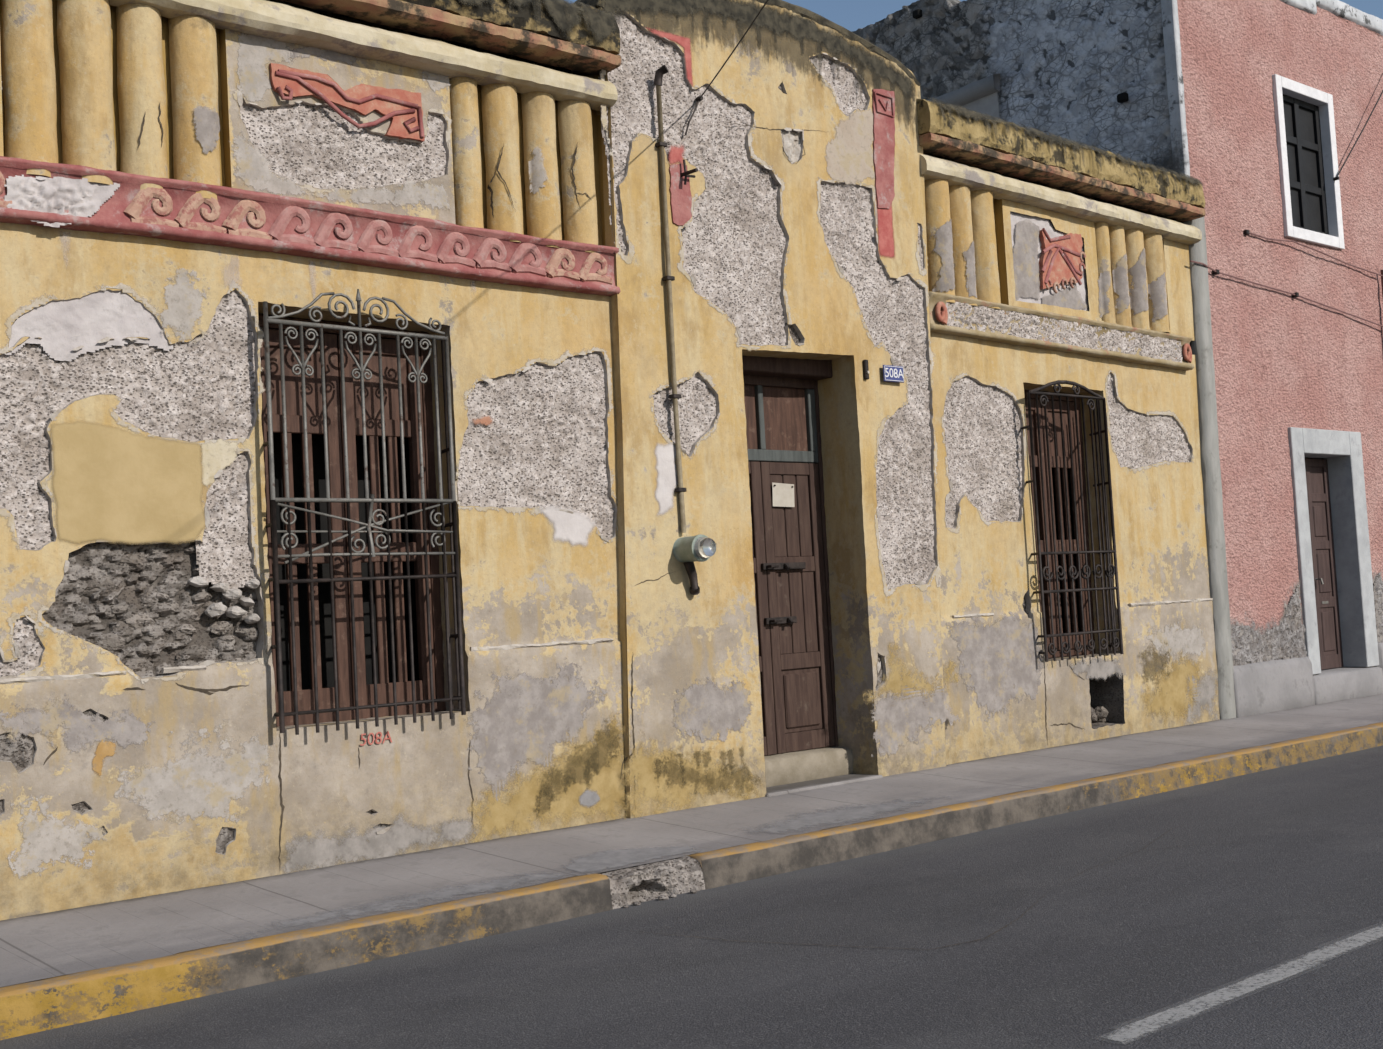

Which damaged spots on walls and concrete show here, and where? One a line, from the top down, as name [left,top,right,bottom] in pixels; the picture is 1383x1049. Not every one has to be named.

flaking render [193,33,452,210]
crack [487,146,515,218]
crack [571,147,592,210]
flaking render [598,11,805,351]
flaking render [809,53,1194,597]
flaking render [0,268,271,684]
flaking render [454,347,618,545]
flaking render [649,370,720,515]
flaking render [1373,573,1383,643]
peeling [0,694,273,855]
damp [284,716,759,873]
spalling [587,854,705,909]